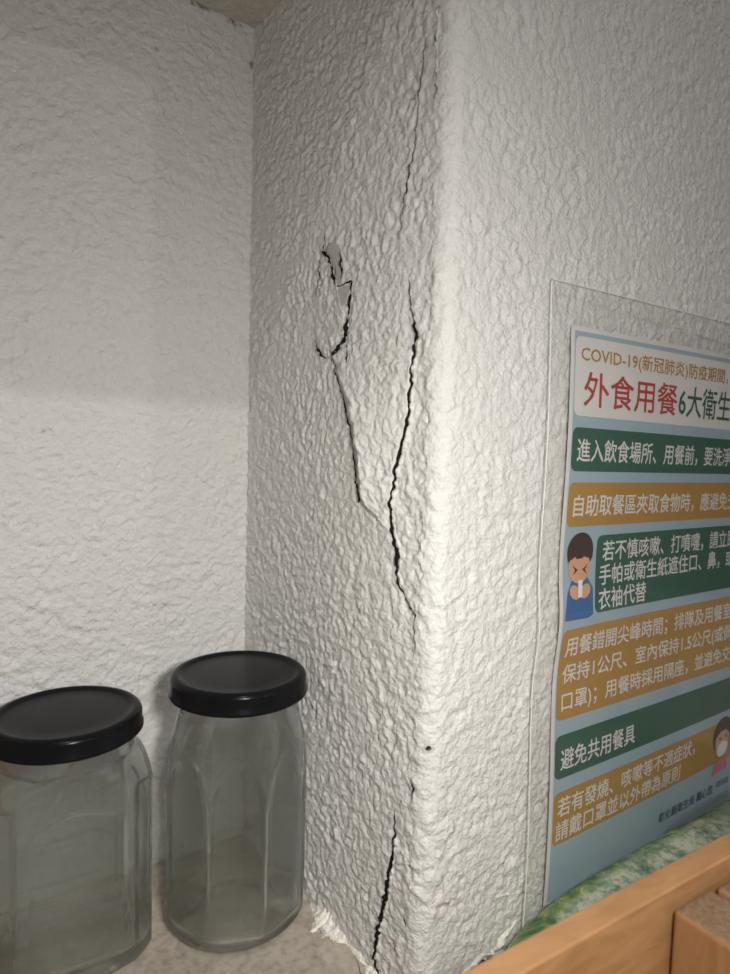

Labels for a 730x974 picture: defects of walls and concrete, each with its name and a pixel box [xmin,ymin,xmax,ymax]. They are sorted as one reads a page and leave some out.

peeling [315,235,353,362]
crack [387,279,421,652]
flaking render [310,903,380,974]
crack [372,784,415,974]
flaking render [461,919,518,973]